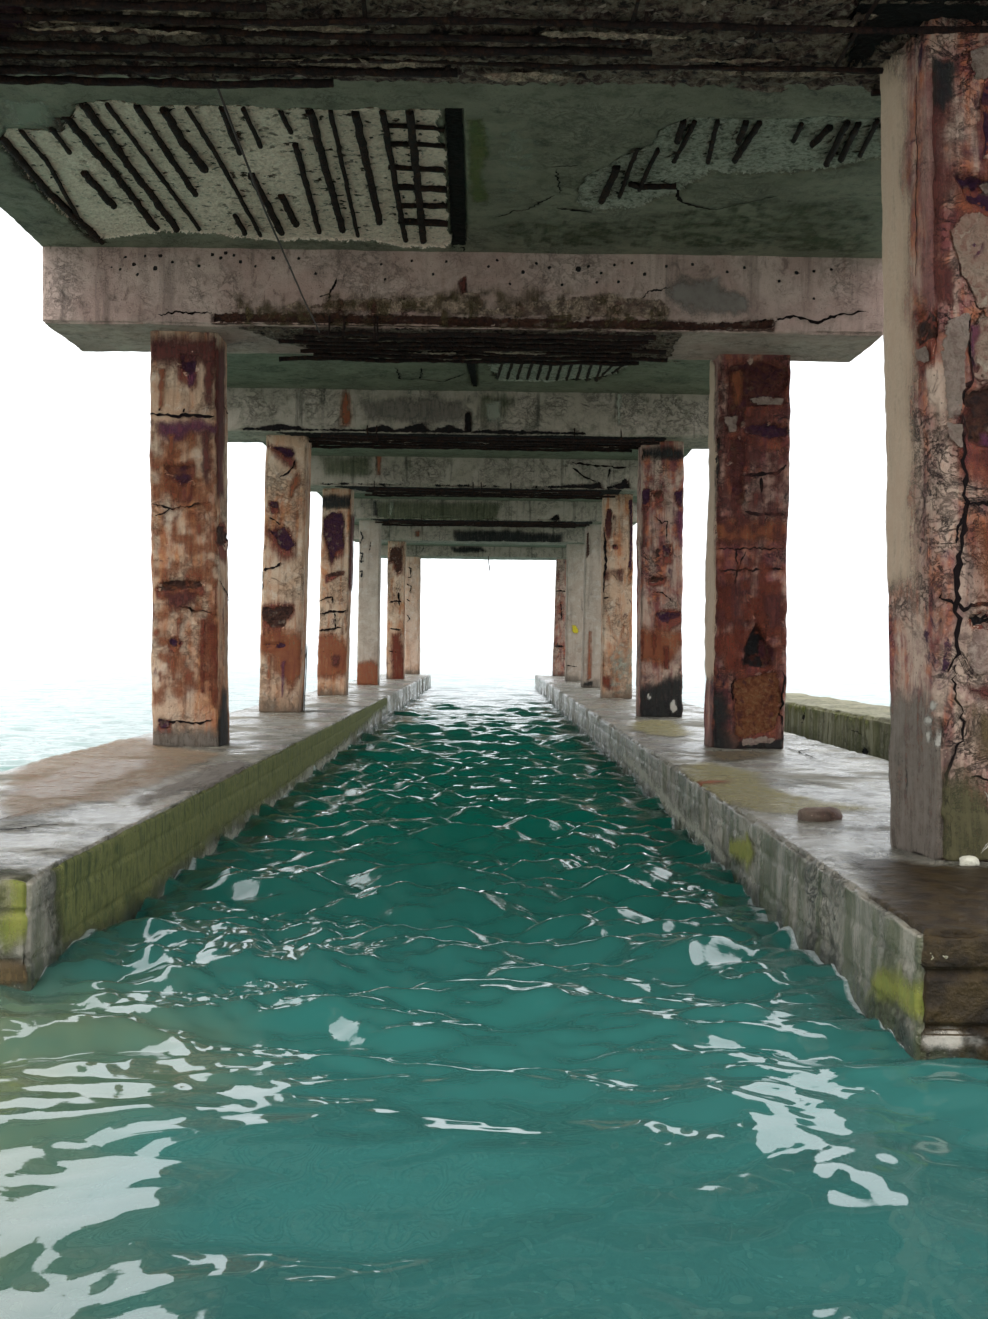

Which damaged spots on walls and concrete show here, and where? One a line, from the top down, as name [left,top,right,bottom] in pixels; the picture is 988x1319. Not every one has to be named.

spalling [0,0,988,587]
crack [712,310,869,325]
rust [932,57,956,303]
rust [149,335,226,704]
rust [640,627,682,670]
spalling [704,358,790,680]
rust [713,367,791,675]
spalling [733,588,785,746]
crack [939,314,988,847]
water stain [0,869,34,882]
water stain [848,693,988,937]
water stain [923,1031,963,1048]